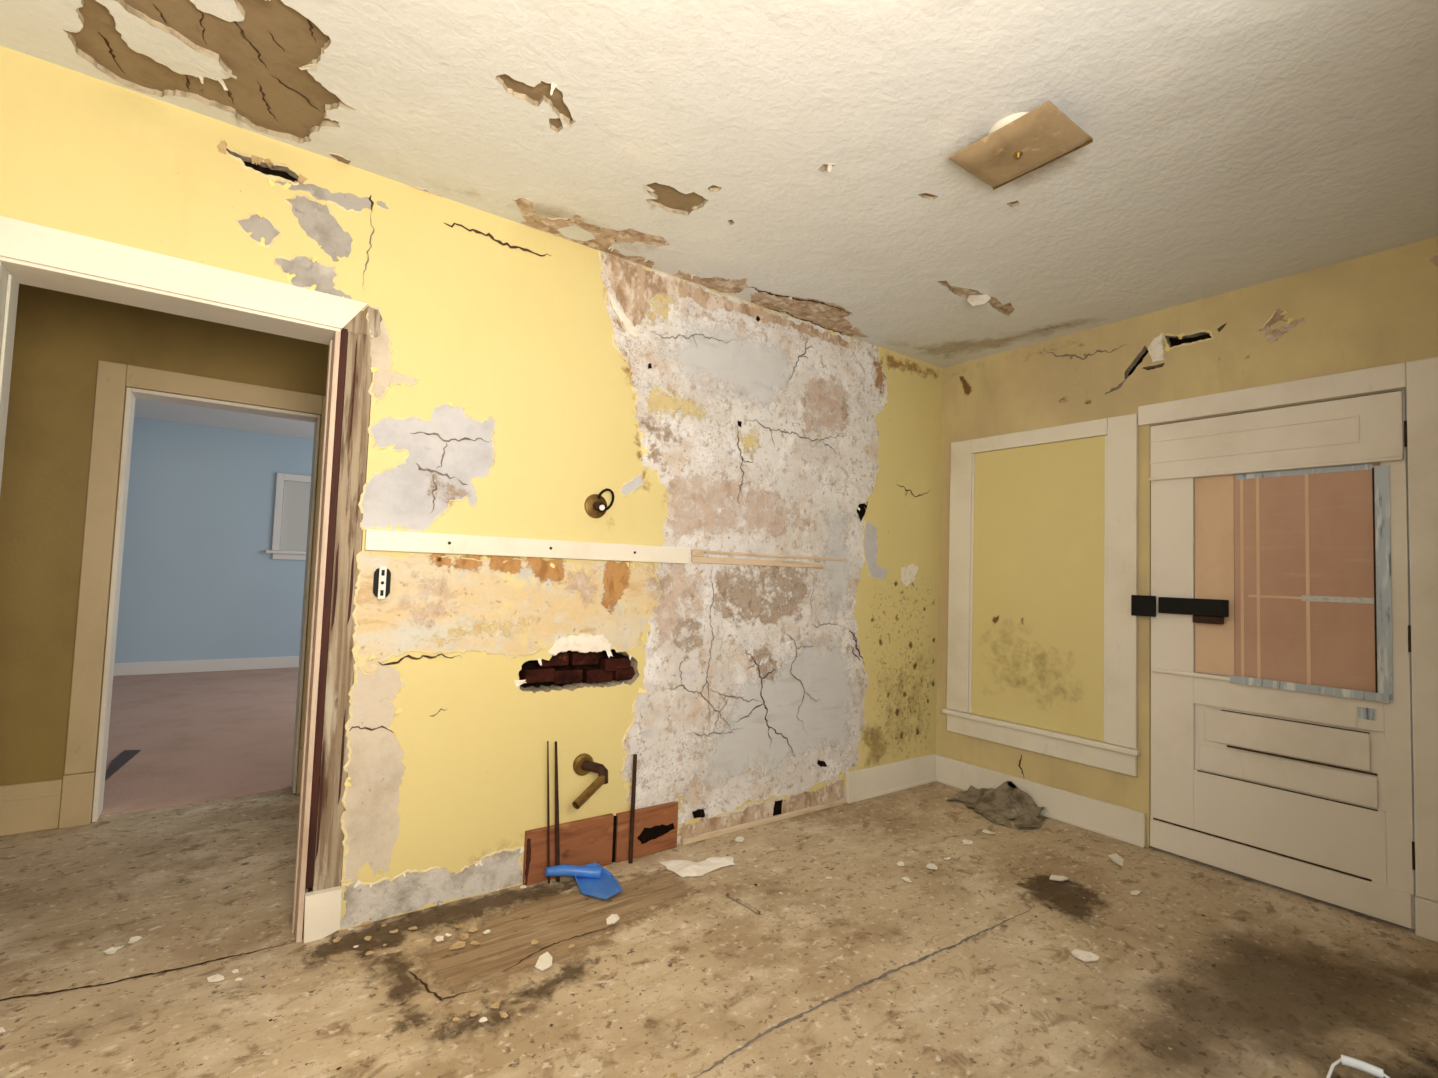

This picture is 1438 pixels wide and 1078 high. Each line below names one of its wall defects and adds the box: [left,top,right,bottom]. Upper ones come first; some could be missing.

spalling [63,0,355,143]
spalling [495,74,576,133]
crack [362,196,375,289]
crack [445,223,551,256]
spalling [643,182,722,216]
peeling [214,140,497,532]
spalling [937,280,1015,316]
crack [1046,344,1125,394]
peeling [340,196,919,928]
crack [672,566,865,760]
leakage [871,581,935,754]